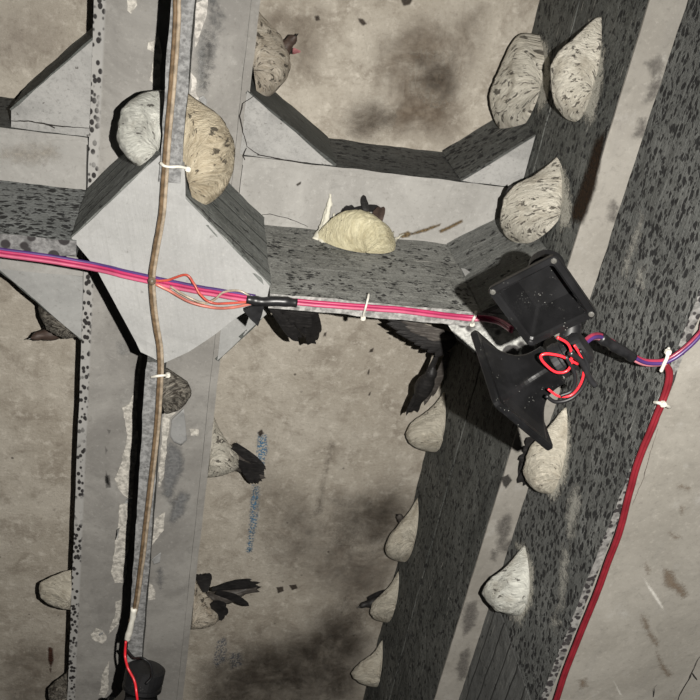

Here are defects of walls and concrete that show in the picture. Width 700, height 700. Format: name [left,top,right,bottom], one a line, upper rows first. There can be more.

leakage [368,33,453,128]
peeling [111,352,142,583]
peeling [158,409,199,487]
peeling [152,512,165,545]